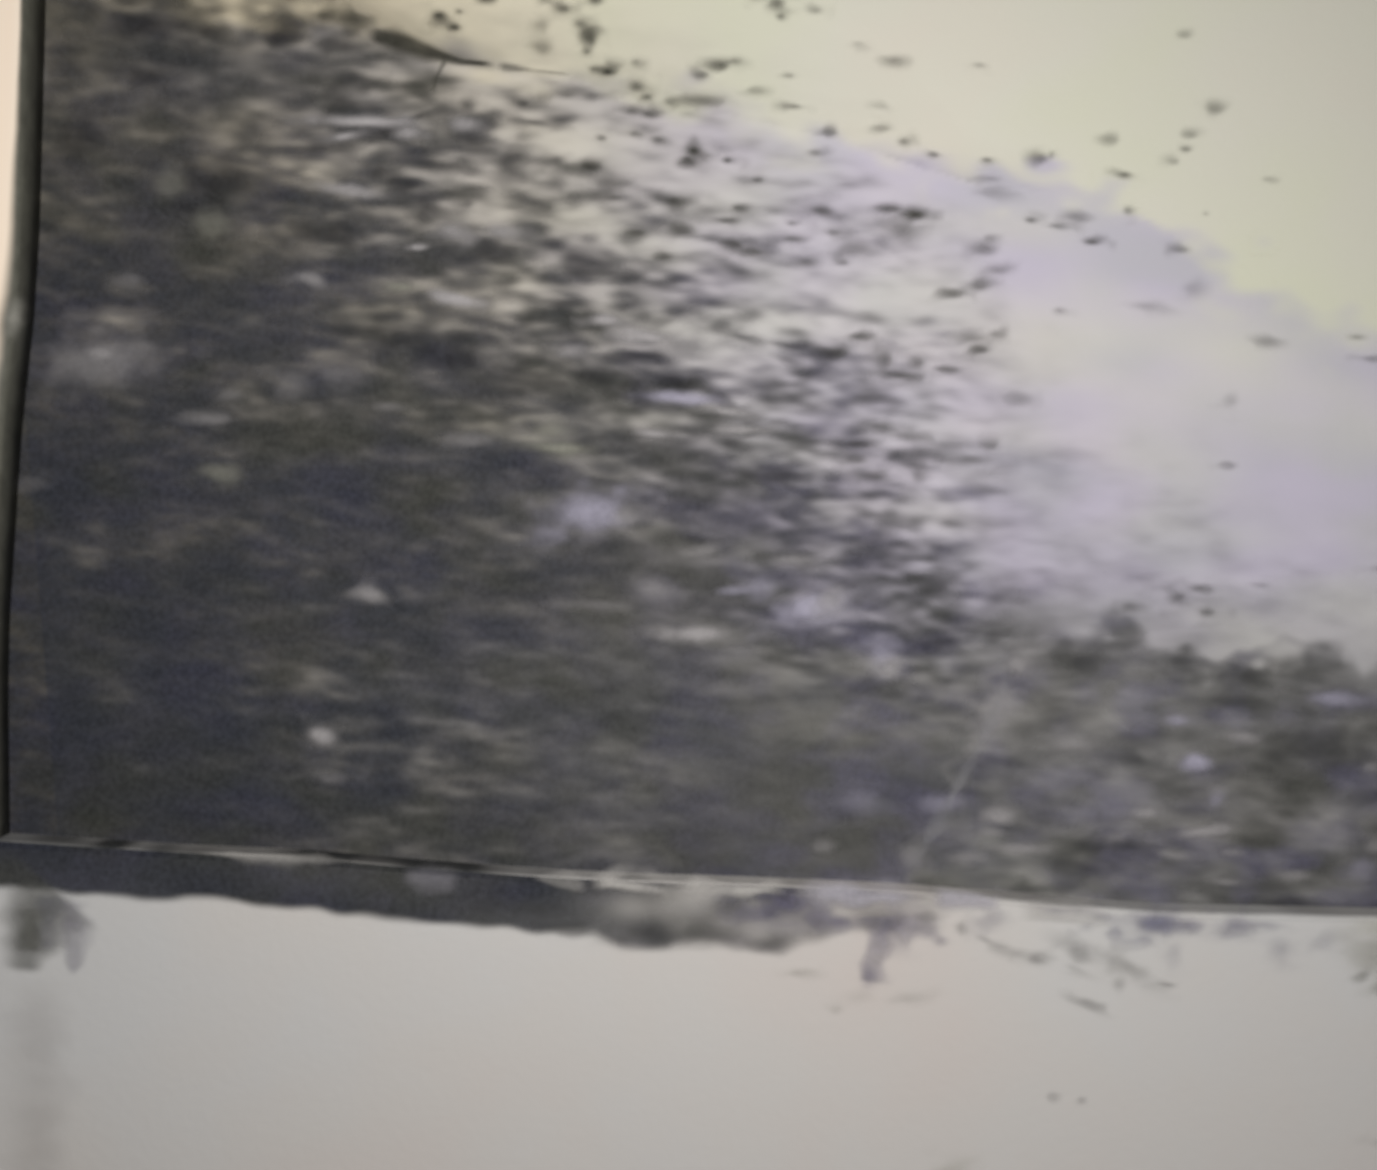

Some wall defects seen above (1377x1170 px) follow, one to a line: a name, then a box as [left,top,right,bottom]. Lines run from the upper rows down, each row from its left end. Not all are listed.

leakage [0,0,1028,948]
leakage [951,624,1377,908]